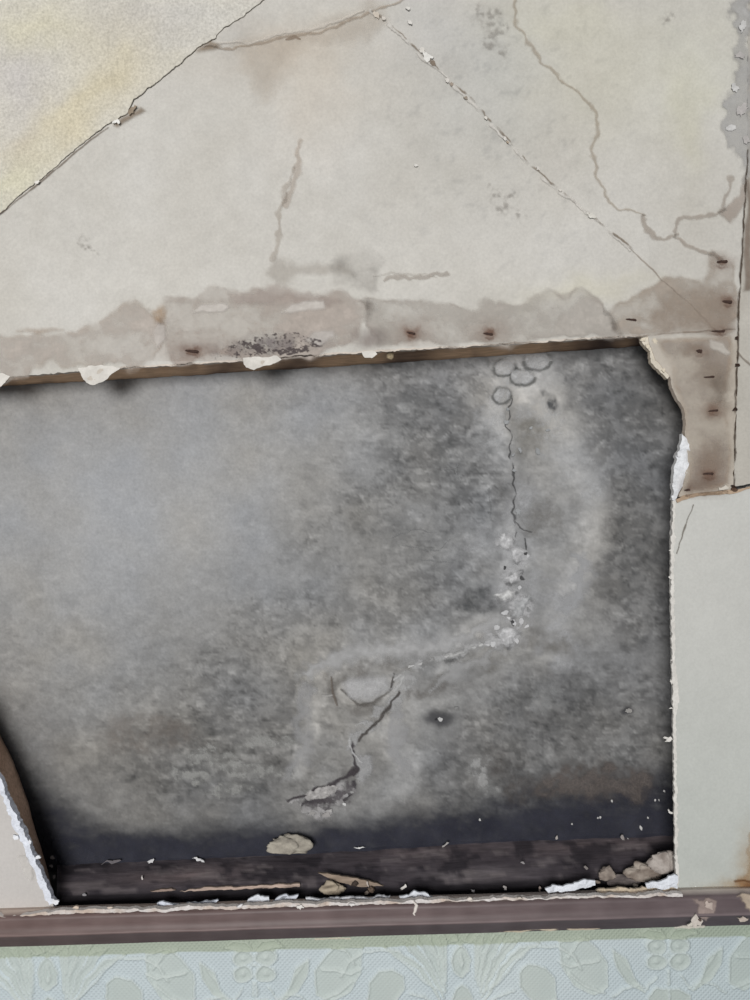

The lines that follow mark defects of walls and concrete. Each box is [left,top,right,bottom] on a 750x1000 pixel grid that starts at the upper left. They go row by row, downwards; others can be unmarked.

peeling [721,0,750,164]
crack [369,6,750,488]
water stain [174,354,195,365]
water stain [220,253,737,391]
flaking render [639,337,670,380]
crack [504,398,550,549]
flaking render [670,434,690,501]
water stain [171,617,503,798]
crack [287,674,404,802]
spalling [289,533,534,821]
flaking render [0,772,683,917]
water stain [23,758,674,872]